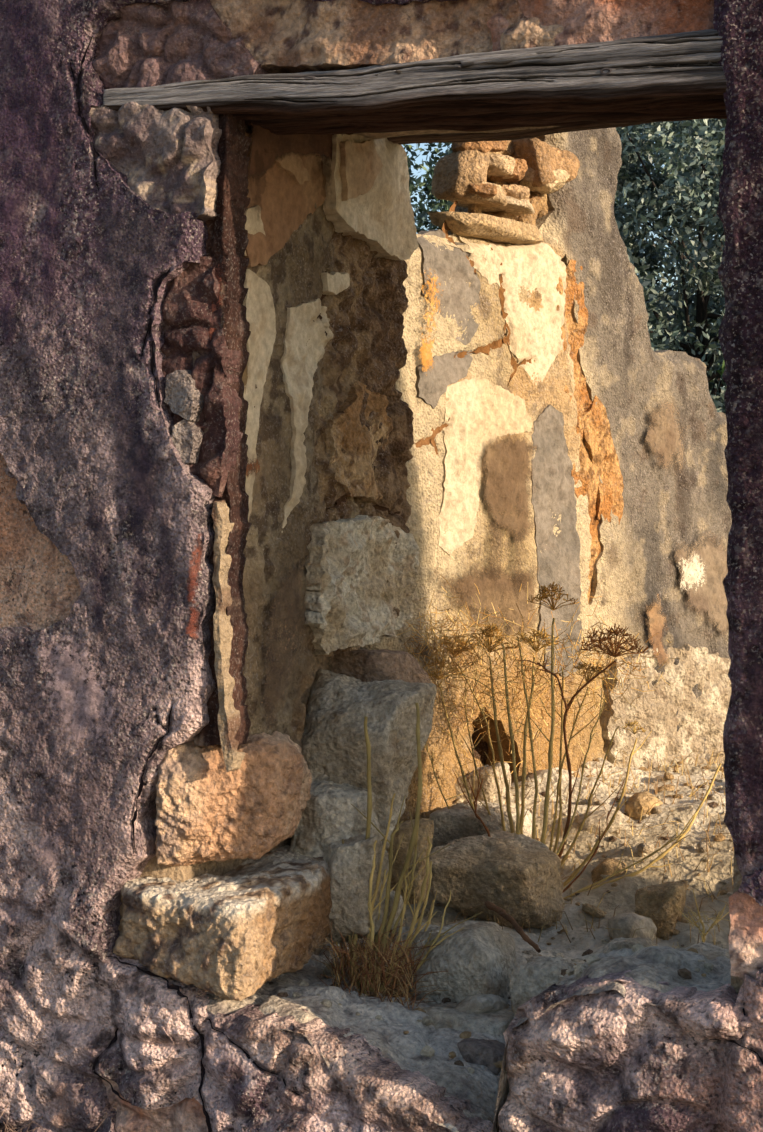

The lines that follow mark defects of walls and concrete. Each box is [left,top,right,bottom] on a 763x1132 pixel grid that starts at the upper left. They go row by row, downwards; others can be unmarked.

crack [70,36,100,190]
spalling [85,0,714,221]
peeling [0,452,81,631]
peeling [728,867,763,987]
crack [92,1028,130,1103]
crack [106,956,301,1132]